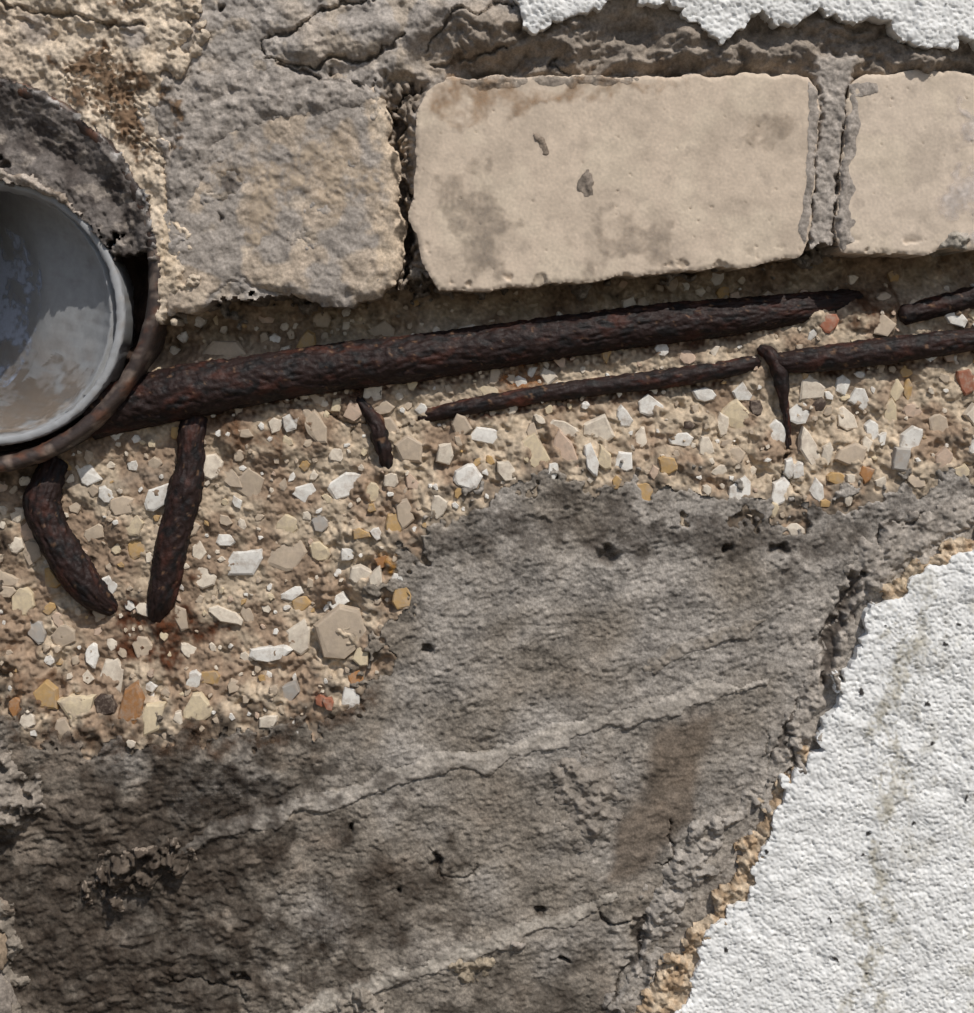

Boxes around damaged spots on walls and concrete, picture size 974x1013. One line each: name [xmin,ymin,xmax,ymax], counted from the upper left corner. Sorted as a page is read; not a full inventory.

crack [386,111,412,279]
spalling [0,0,974,760]
corrosion [468,403,541,419]
corrosion [502,356,586,389]
corrosion [555,388,667,407]
corrosion [690,377,734,389]
damp [0,533,8,554]
corrosion [115,597,231,670]
damp [0,747,296,1013]
crack [600,914,646,1000]